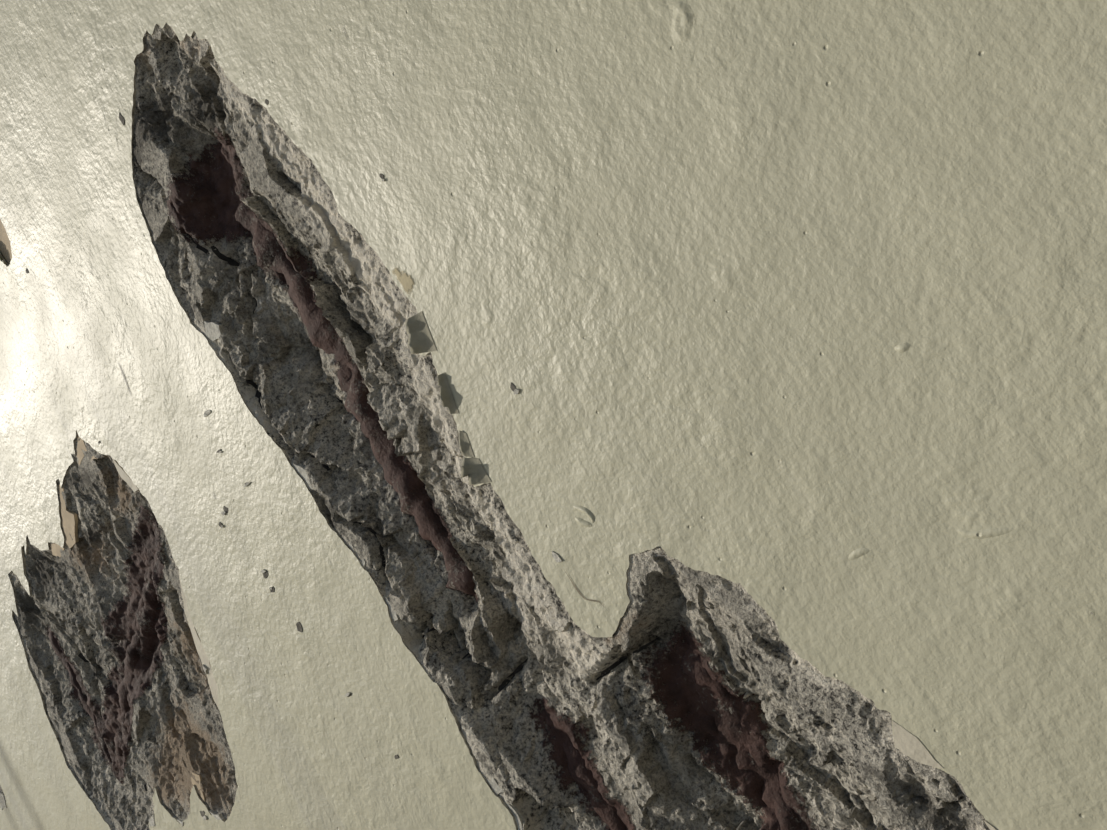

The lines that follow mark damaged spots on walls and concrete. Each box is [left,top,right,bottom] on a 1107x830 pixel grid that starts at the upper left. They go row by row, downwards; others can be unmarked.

peeling [0,219,12,267]
corrosion [165,127,321,322]
spalling [119,23,996,830]
corrosion [45,499,168,786]
spalling [8,435,238,830]
corrosion [525,697,634,830]
corrosion [638,620,820,830]